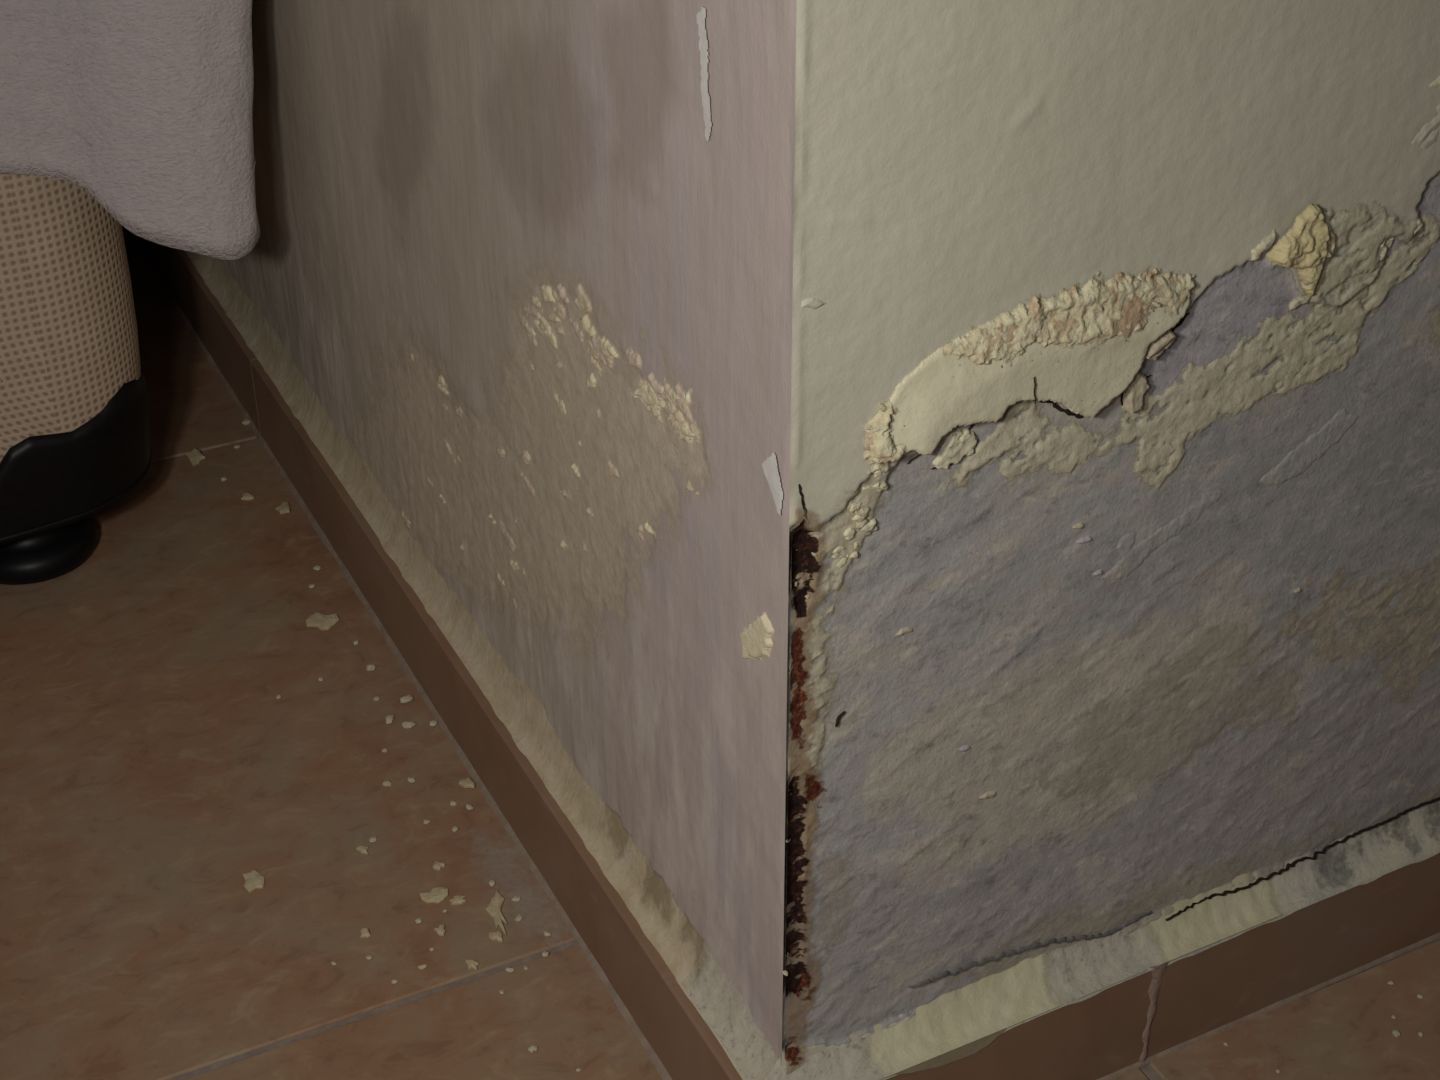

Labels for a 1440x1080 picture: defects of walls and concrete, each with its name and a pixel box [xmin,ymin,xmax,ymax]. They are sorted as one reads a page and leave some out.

peeling [350,264,710,650]
rust [790,519,823,749]
peeling [740,172,1440,1052]
rust [782,774,826,1001]
crack [908,797,1440,988]
rust [785,1036,801,1066]